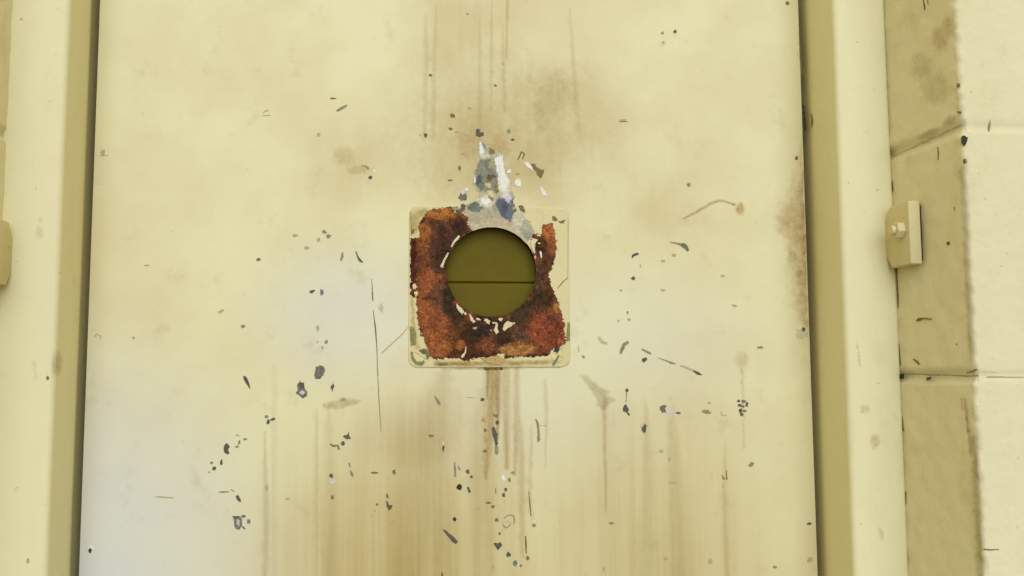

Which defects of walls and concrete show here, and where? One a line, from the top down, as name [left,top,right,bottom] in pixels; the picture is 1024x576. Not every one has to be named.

peeling [448,129,547,259]
rust [410,206,567,372]
peeling [296,365,334,398]
peeling [208,434,247,473]
peeling [233,515,251,530]